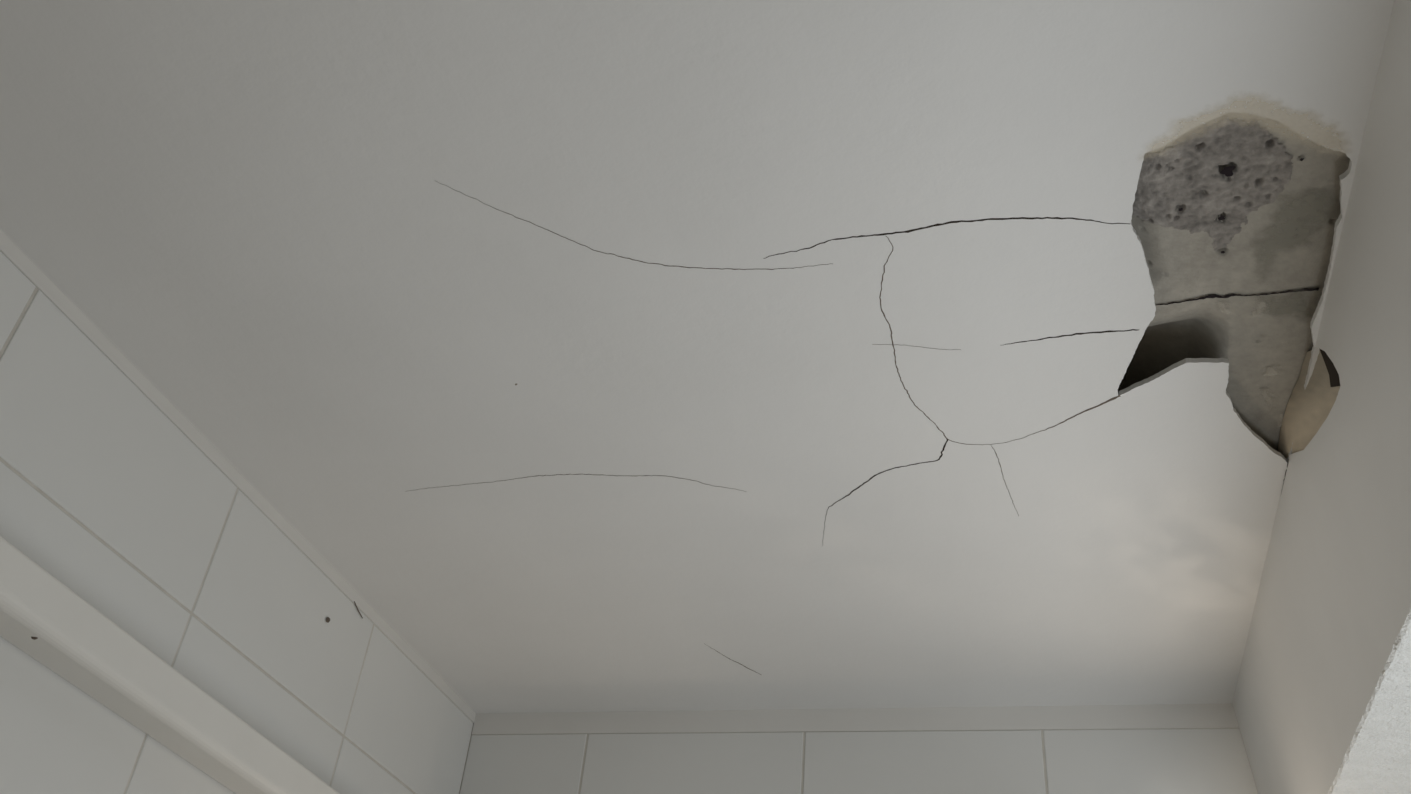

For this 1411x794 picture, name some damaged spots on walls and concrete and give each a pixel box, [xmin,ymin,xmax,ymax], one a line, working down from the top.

crack [436,181,1138,546]
spalling [1118,112,1350,459]